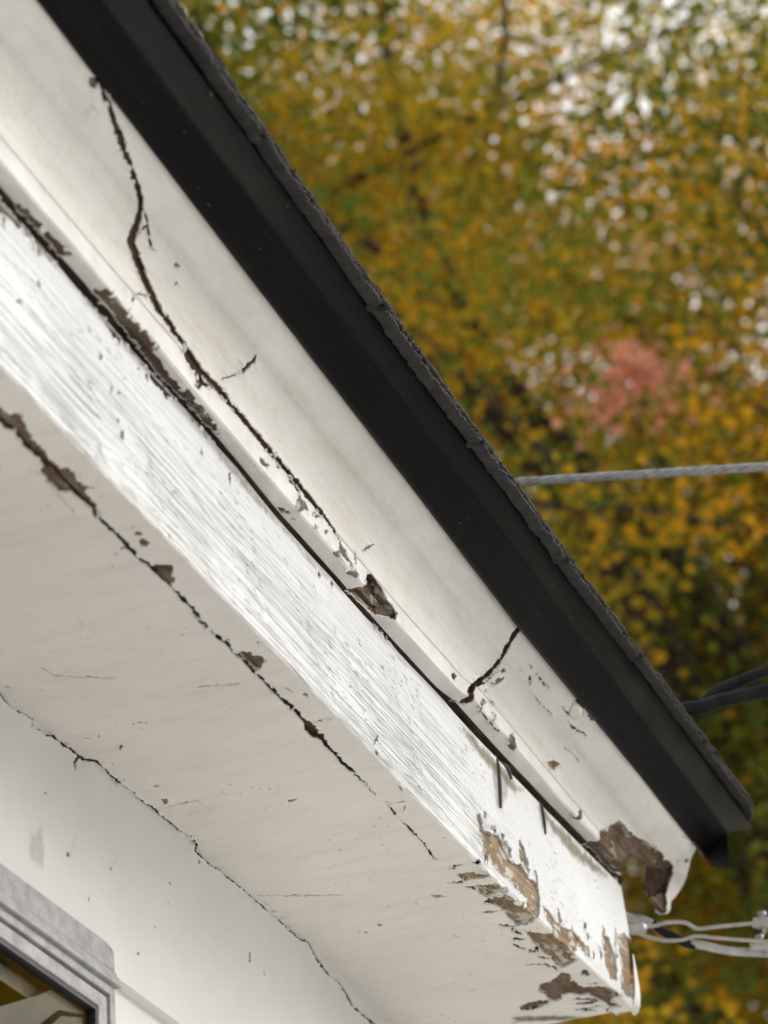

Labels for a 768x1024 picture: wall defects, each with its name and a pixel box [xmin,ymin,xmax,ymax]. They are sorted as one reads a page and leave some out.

peeling [0,196,74,268]
peeling [78,287,220,442]
crack [95,78,342,542]
crack [0,408,480,870]
crack [449,627,595,762]
crack [0,686,376,1024]
peeling [430,811,640,1016]